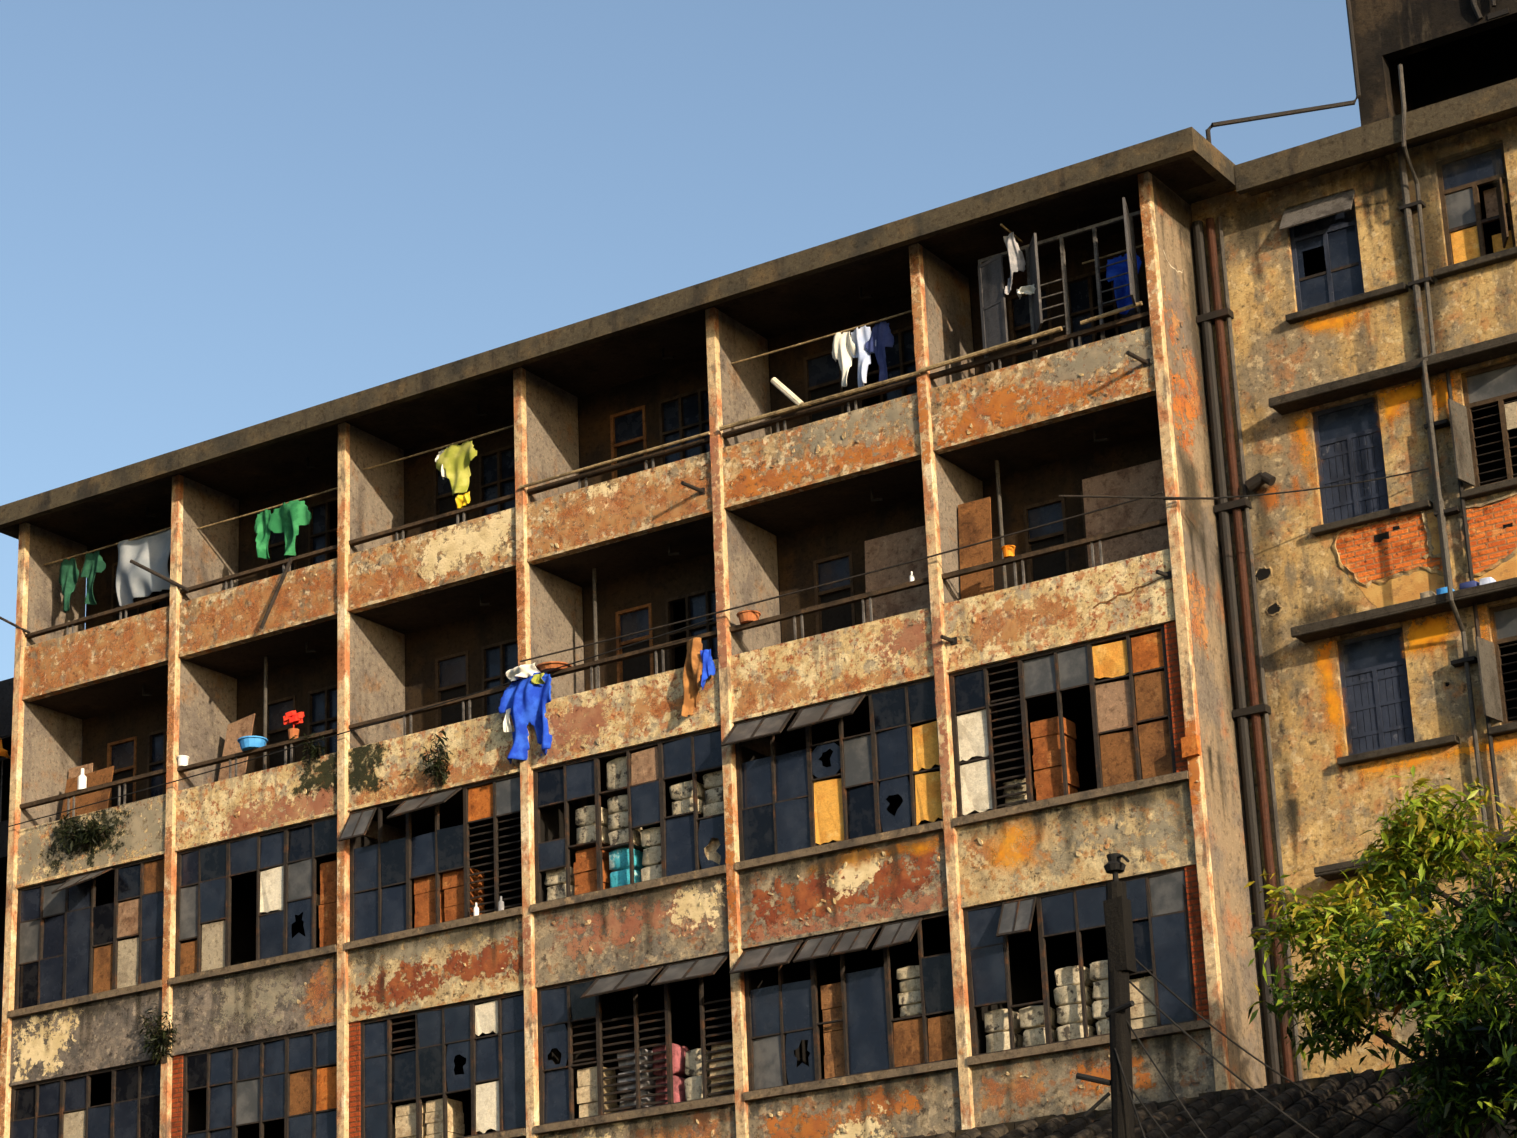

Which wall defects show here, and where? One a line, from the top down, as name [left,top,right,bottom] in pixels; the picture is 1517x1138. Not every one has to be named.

flaking render [1331,491,1517,608]
corrosion [810,838,938,870]
corrosion [996,826,1034,867]